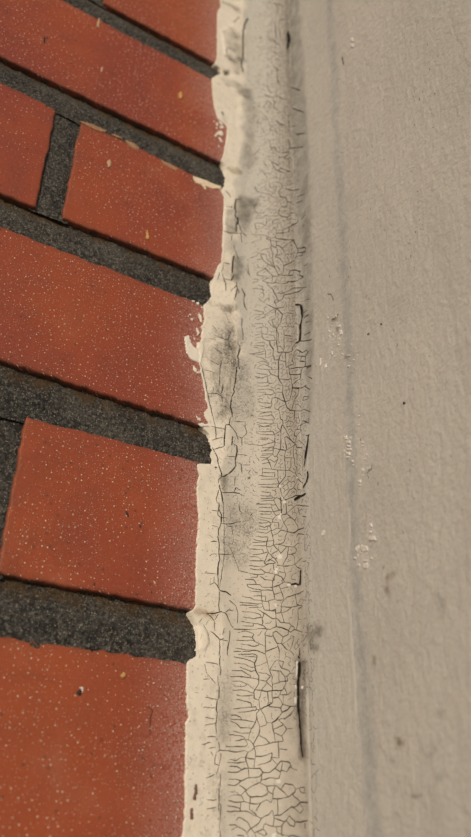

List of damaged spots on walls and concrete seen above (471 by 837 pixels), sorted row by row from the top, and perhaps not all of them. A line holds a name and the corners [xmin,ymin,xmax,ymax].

peeling [184,300,204,374]
crack [175,0,320,837]